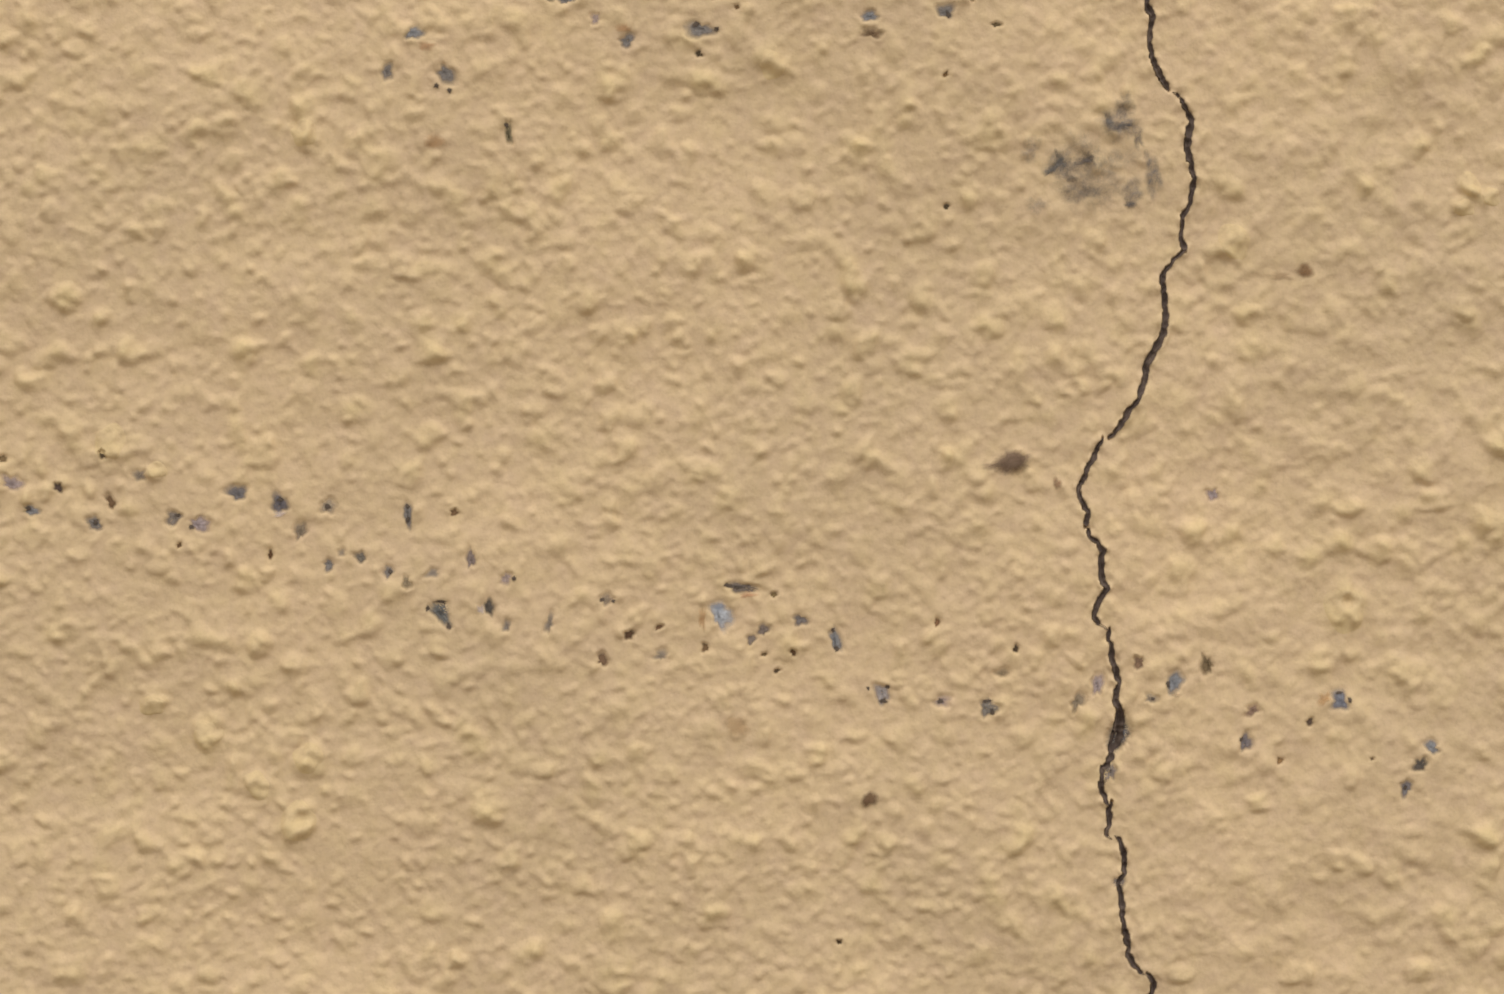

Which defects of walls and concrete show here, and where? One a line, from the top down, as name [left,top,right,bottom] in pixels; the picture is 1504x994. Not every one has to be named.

crack [1077,0,1197,994]